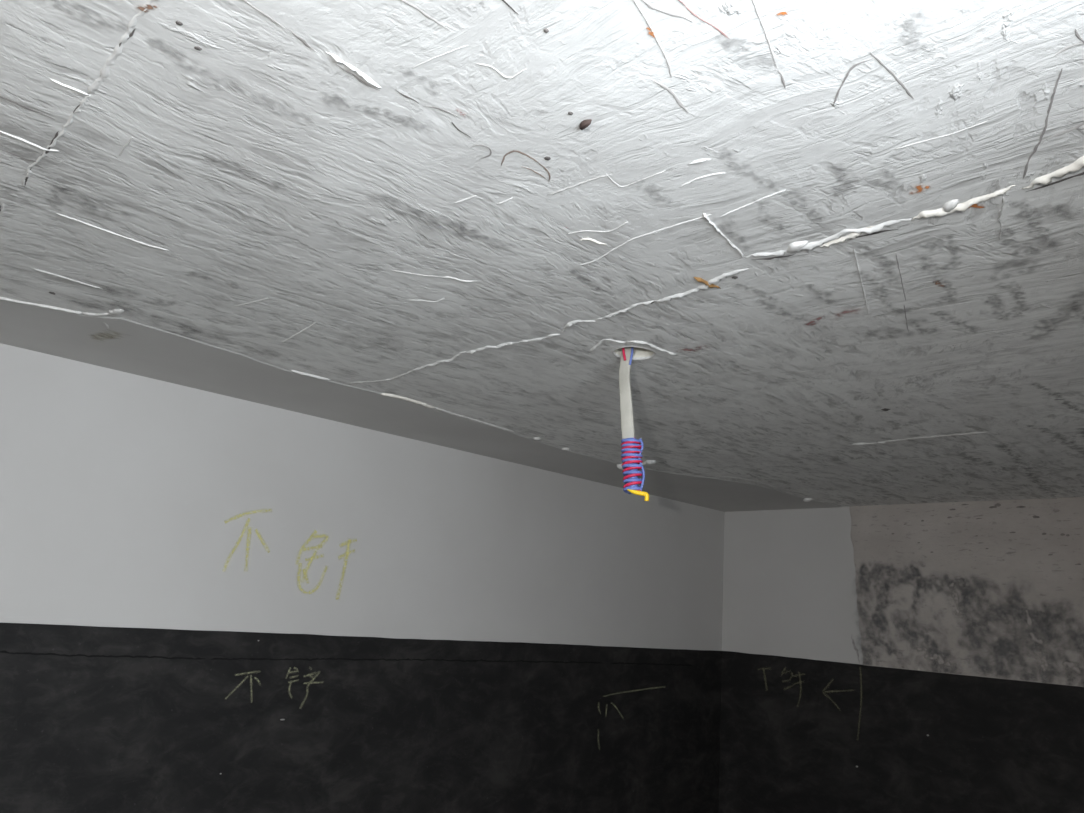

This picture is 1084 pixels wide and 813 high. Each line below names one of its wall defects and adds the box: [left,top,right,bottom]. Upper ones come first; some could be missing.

crack [0,0,157,214]
crack [242,0,471,138]
crack [349,29,1084,384]
water stain [858,565,1084,682]